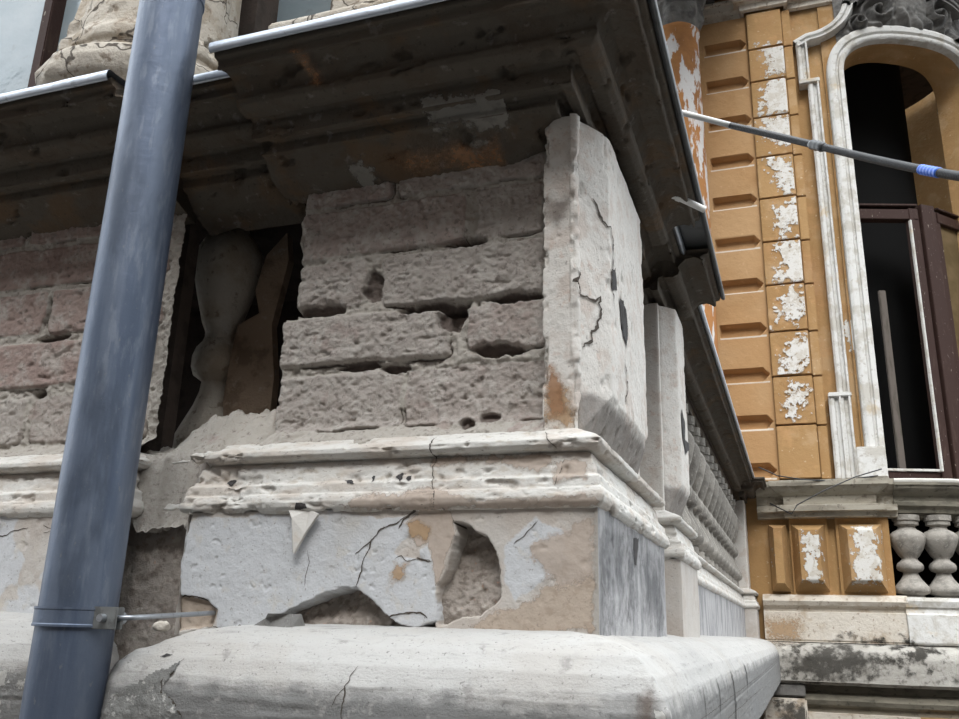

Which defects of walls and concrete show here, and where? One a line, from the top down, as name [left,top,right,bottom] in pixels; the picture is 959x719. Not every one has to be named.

peeling [754,41,813,422]
crack [572,199,615,347]
corrosion [544,365,572,427]
peeling [289,503,320,554]
crack [355,439,467,585]
peeling [297,473,599,634]
peeling [799,529,825,584]
peeling [849,519,903,596]
spalling [918,548,936,598]
spalling [950,551,959,584]
damp [780,631,941,684]
crack [331,666,358,719]